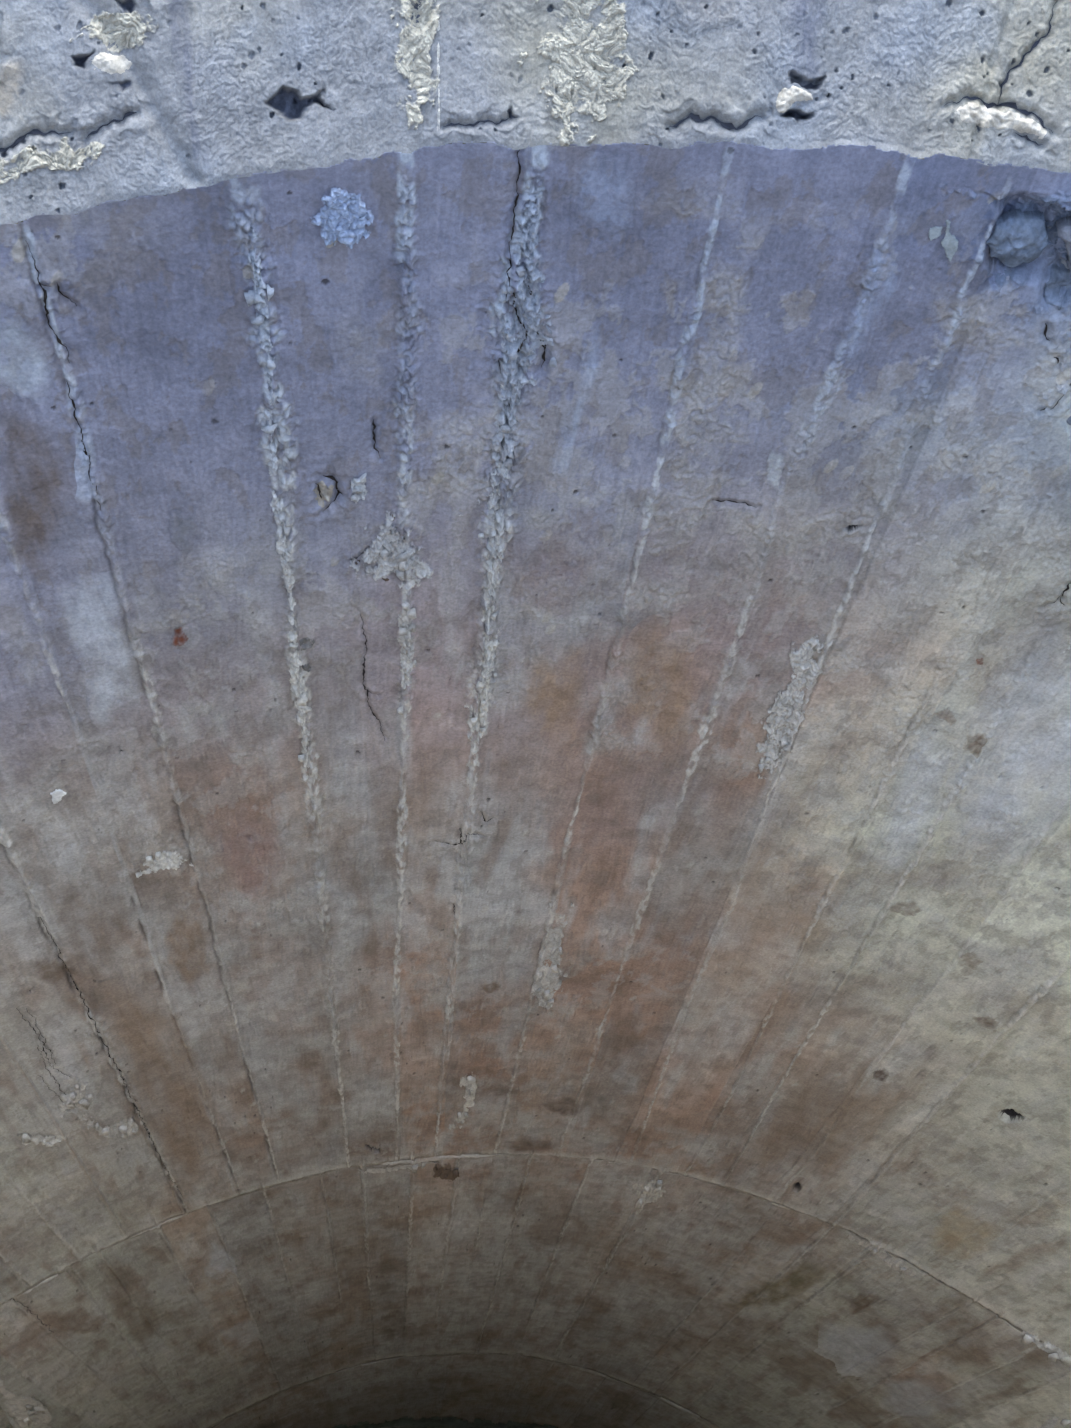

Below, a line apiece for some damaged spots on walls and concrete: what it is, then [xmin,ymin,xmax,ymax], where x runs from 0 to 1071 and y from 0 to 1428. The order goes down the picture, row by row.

spalling [305,175,374,251]
crack [25,240,101,510]
rust [171,627,189,647]
crack [360,614,385,741]
spalling [447,1071,478,1130]
peeling [0,1372,52,1428]